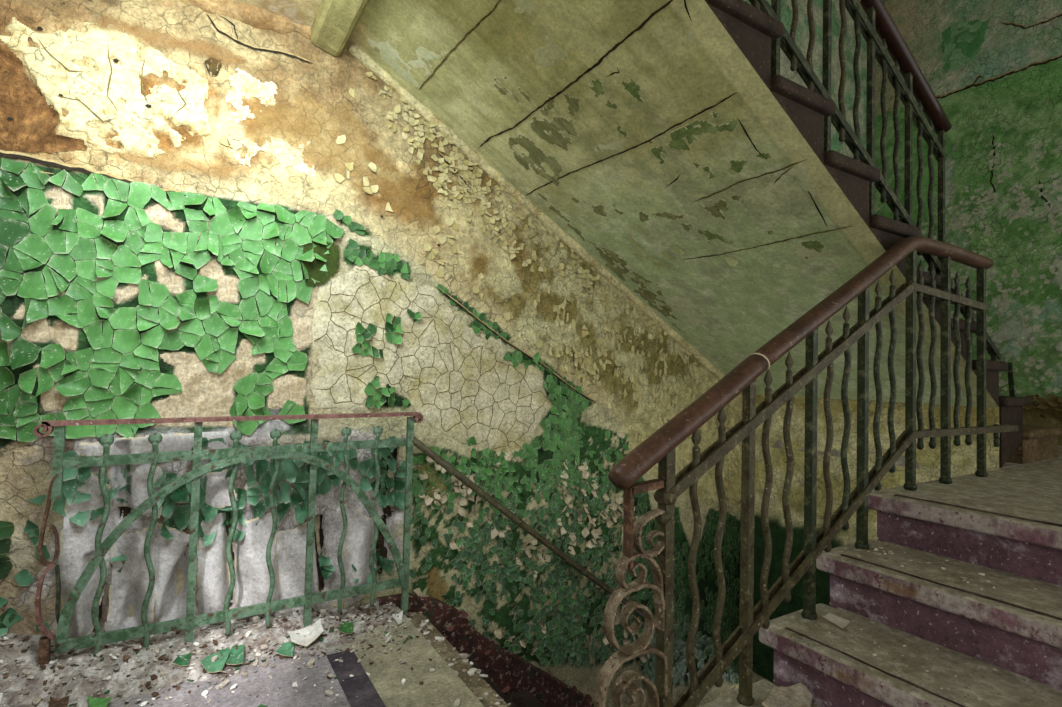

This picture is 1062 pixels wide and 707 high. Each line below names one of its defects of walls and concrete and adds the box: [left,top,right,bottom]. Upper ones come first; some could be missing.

crack [207,13,314,64]
peeling [367,38,448,88]
crack [419,0,501,90]
crack [480,0,692,147]
crack [0,150,186,196]
crack [525,92,807,202]
peeling [936,142,1062,236]
peeling [0,17,410,527]
peeling [149,72,712,693]
crack [311,262,597,462]
peeling [672,441,742,687]
spalling [762,682,813,707]